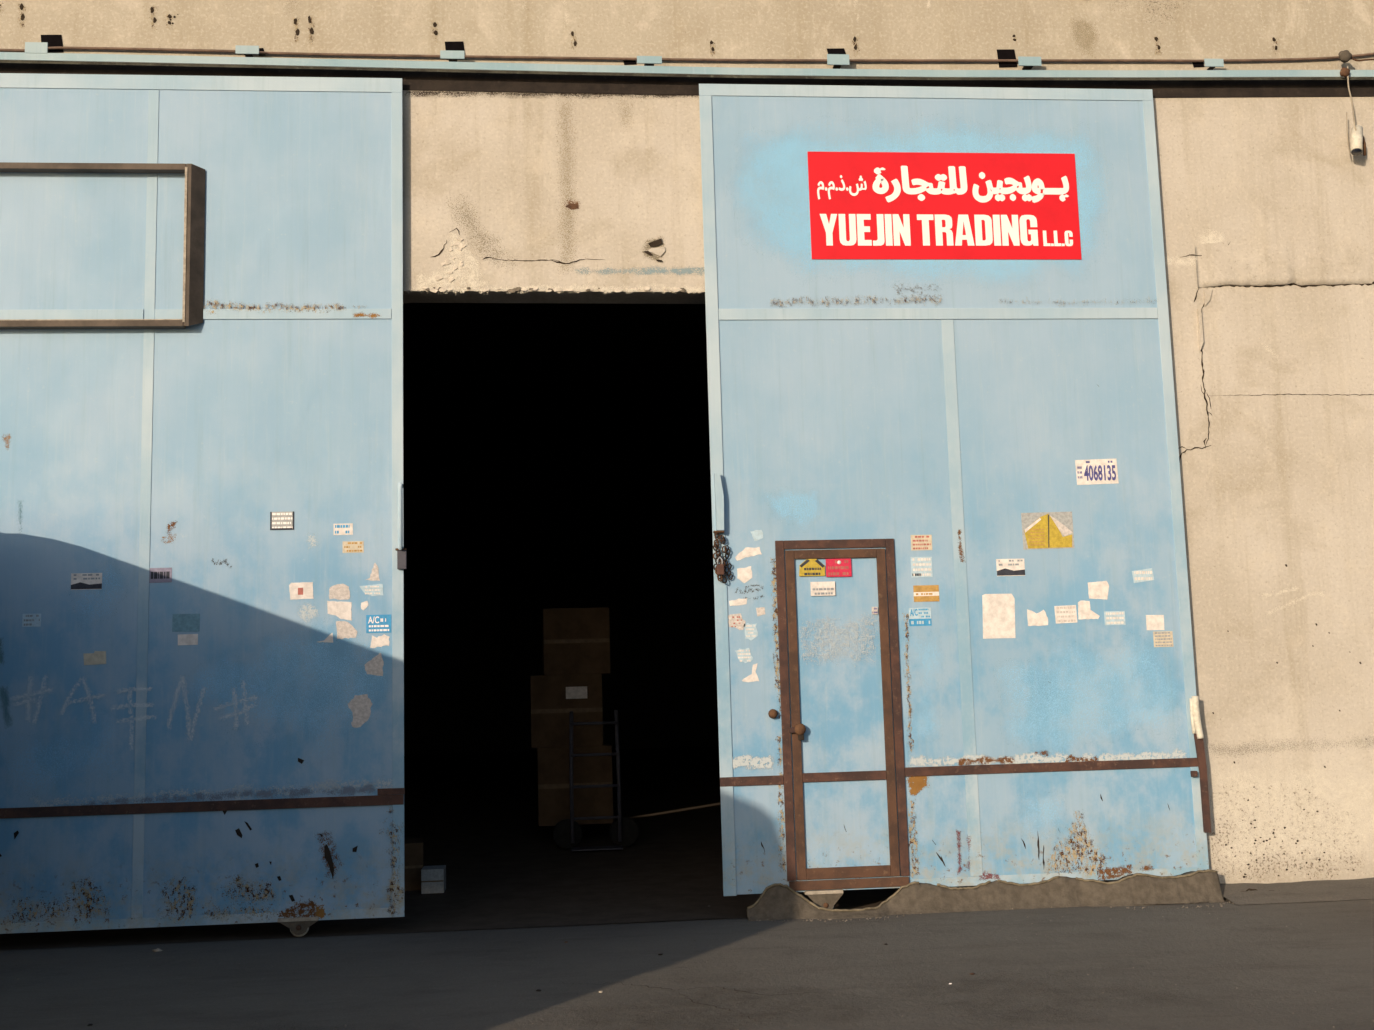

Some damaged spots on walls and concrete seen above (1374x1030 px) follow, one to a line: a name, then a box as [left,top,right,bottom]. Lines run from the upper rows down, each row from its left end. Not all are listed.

rust [204,300,382,318]
crack [482,256,605,264]
spalling [407,232,705,294]
crack [1183,244,1374,312]
crack [1179,346,1373,462]
rust [904,614,1187,881]
rust [30,777,392,815]
rust [732,736,786,872]
rust [315,831,357,881]
rust [379,807,405,914]
rust [7,877,109,926]
rust [157,861,326,924]